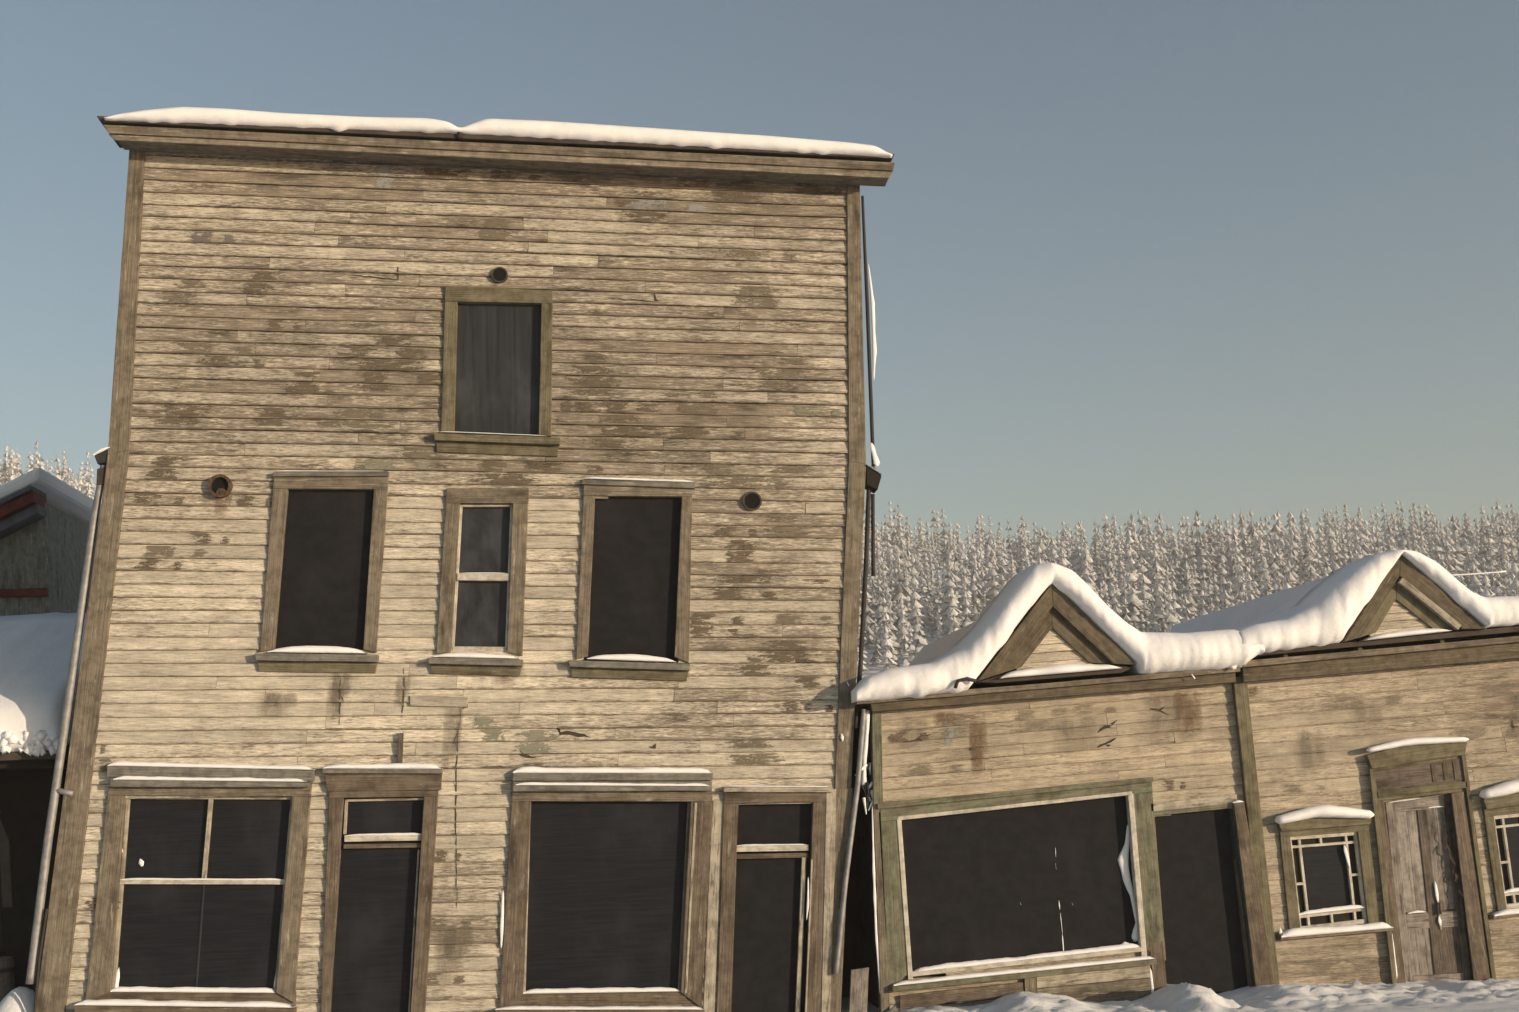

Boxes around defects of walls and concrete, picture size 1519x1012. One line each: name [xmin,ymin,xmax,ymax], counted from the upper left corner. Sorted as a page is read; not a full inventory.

peeling [334,335,443,391]
peeling [149,405,212,425]
peeling [253,372,320,426]
peeling [132,533,230,570]
peeling [473,717,559,753]